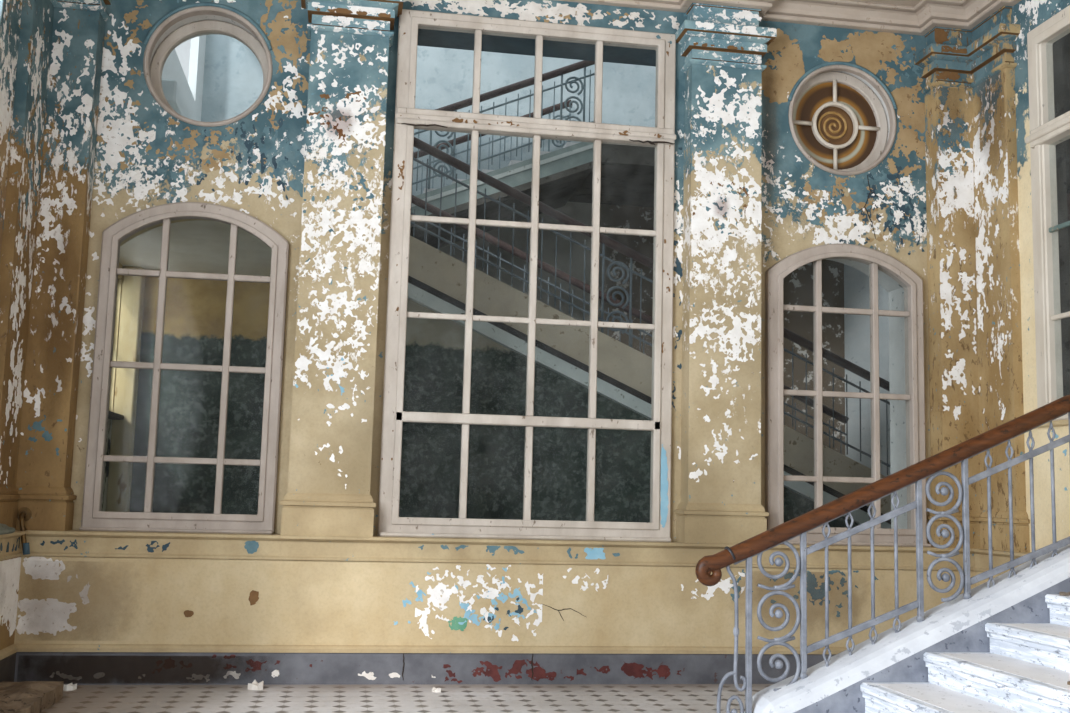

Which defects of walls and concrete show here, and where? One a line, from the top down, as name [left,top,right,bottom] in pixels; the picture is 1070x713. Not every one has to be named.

flaking render [403,0,680,31]
peeling [935,28,967,54]
peeling [0,0,391,489]
peeling [660,9,926,528]
peeling [938,97,1011,420]
peeling [563,568,608,591]
peeling [415,564,543,641]
peeling [358,671,400,680]
peeling [432,659,681,683]